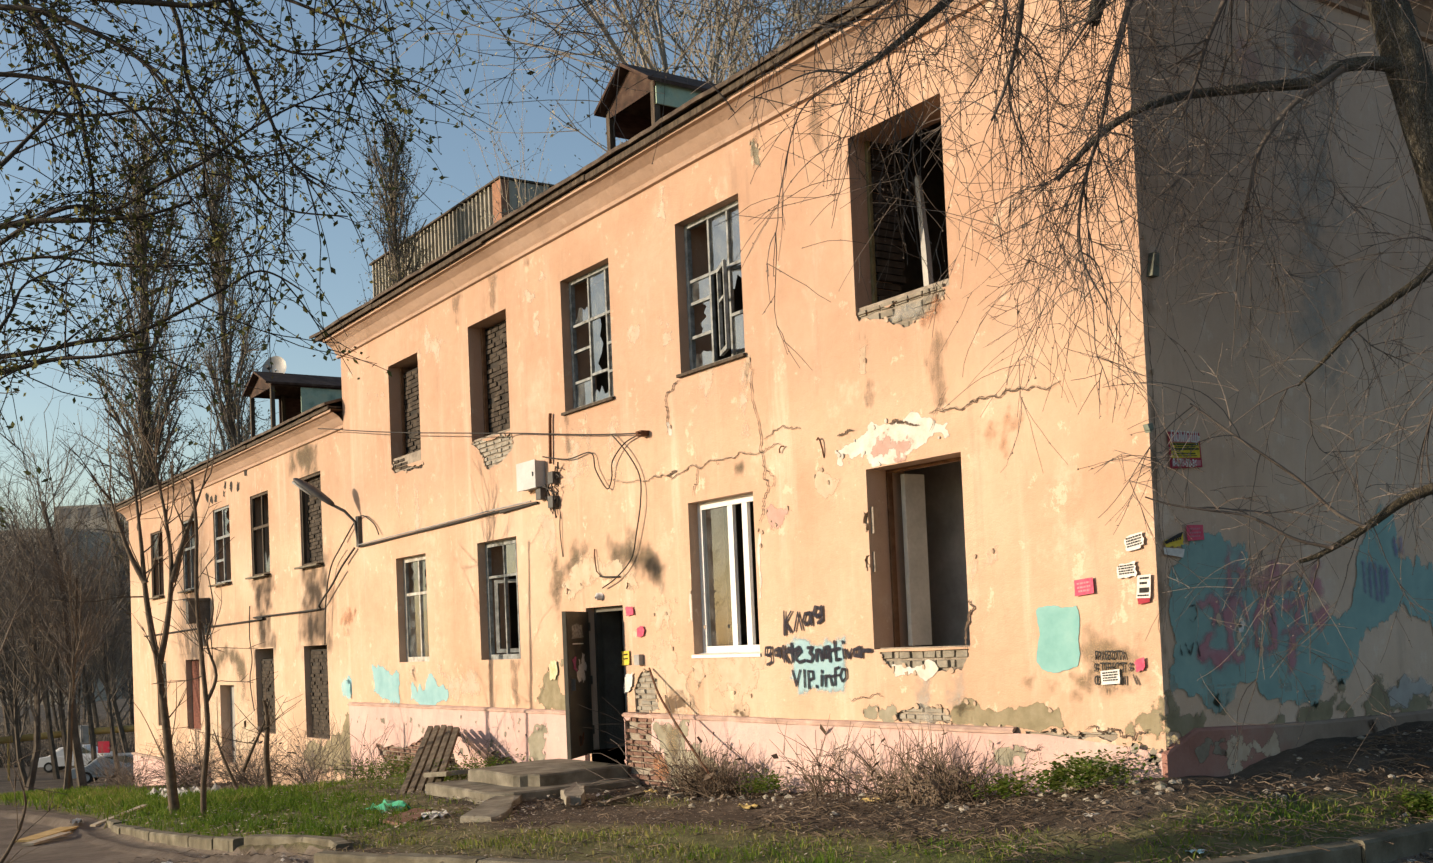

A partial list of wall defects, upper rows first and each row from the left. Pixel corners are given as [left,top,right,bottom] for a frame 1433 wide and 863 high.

flaking render [857,279,949,327]
crack [889,380,1060,432]
flaking render [473,428,514,469]
crack [607,357,801,521]
peeling [813,411,949,499]
damp [613,545,660,579]
flaking render [879,645,970,681]
flaking render [624,597,766,790]
flaking render [861,698,1161,793]
peeling [1226,730,1280,774]